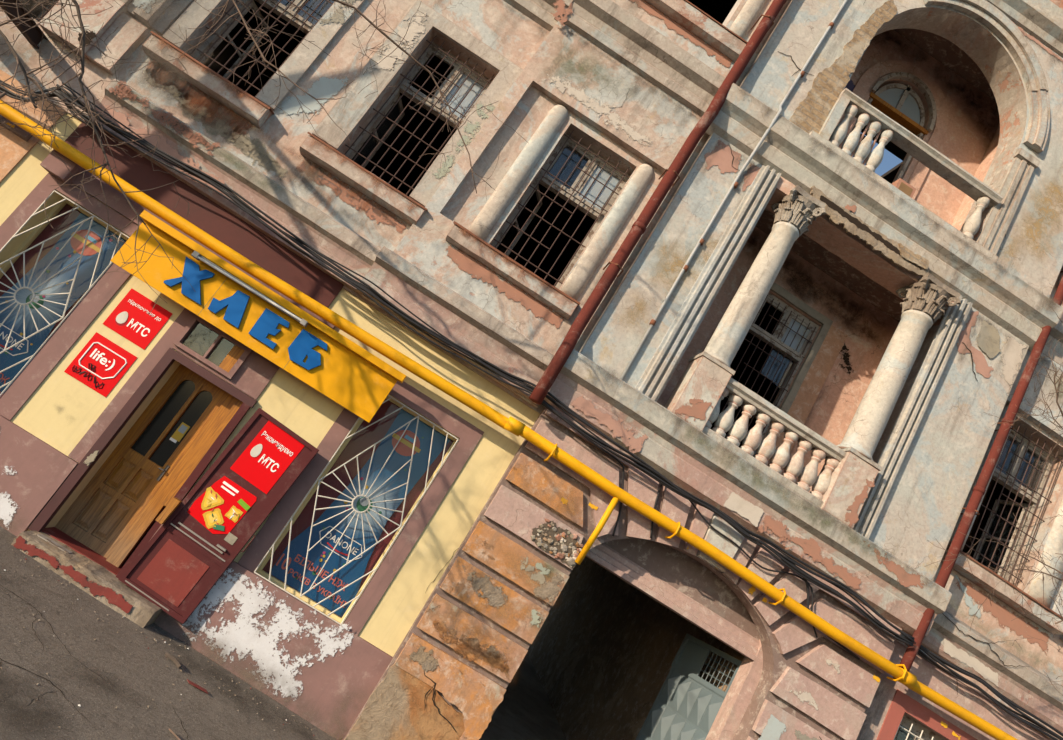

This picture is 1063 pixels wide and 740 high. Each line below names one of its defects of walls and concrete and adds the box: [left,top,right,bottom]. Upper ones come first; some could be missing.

flaking render [789,0,898,134]
flaking render [704,137,760,191]
flaking render [956,311,1027,387]
peeling [572,396,648,453]
flaking render [462,565,508,608]
flaking render [520,519,584,627]
peeling [723,492,862,589]
peeling [863,540,926,589]
peeling [181,568,353,701]
crack [423,669,457,733]